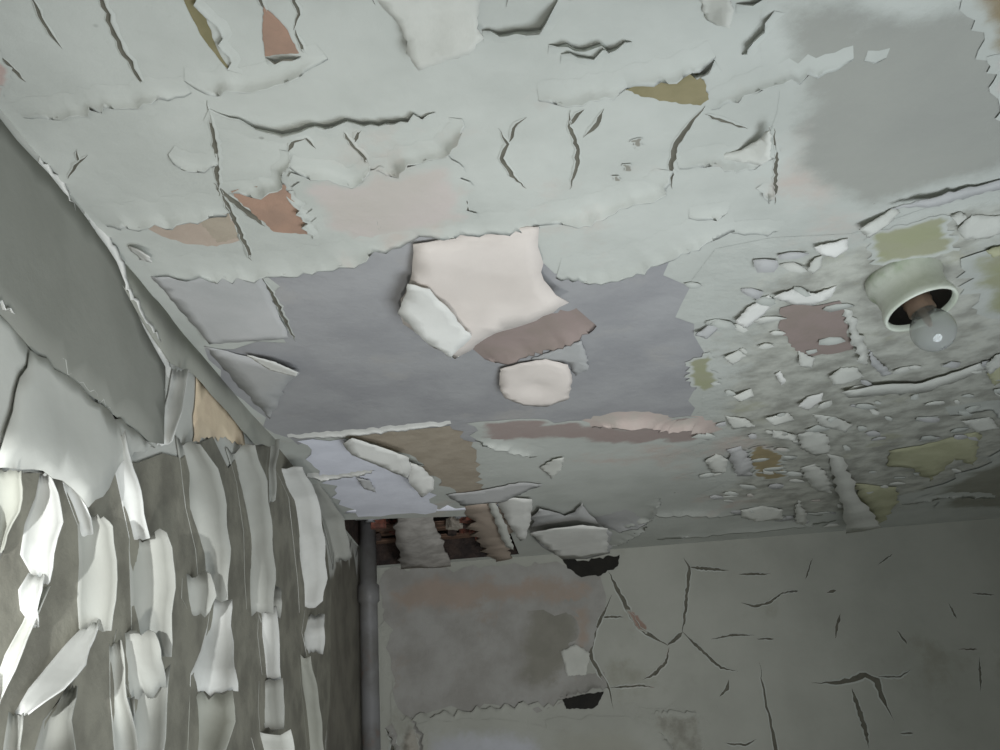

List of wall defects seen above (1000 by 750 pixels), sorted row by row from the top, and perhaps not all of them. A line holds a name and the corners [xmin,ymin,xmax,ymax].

peeling [10,0,328,121]
spalling [125,0,1000,616]
spalling [0,119,239,750]
spalling [175,378,331,750]
spalling [378,621,547,750]
spalling [560,644,607,709]
crack [589,558,813,750]
crack [827,589,841,638]
crack [814,669,913,748]
crack [958,648,983,692]